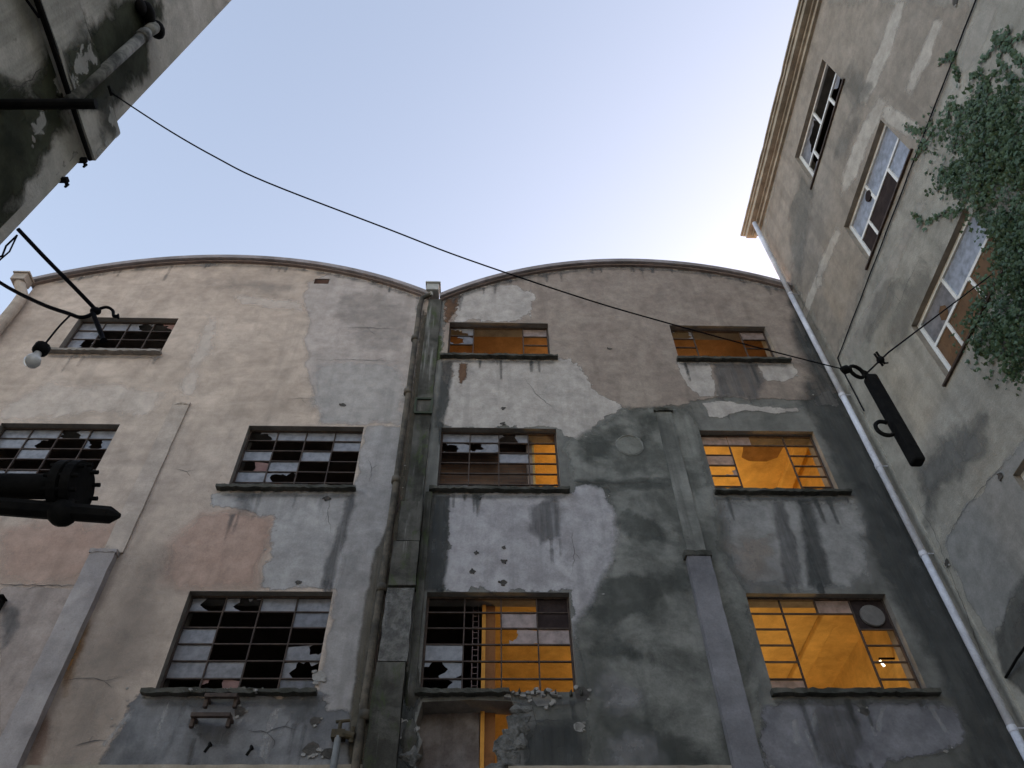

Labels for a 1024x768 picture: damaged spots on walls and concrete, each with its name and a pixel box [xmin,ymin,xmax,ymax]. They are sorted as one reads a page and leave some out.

leakage [63,0,163,139]
leakage [0,52,68,228]
corrosion [458,363,467,384]
flaking render [441,0,970,768]
flaking render [89,274,423,768]
leakage [322,494,353,591]
leakage [532,496,559,552]
leakage [618,478,671,489]
leakage [595,568,689,621]
leakage [604,709,707,766]